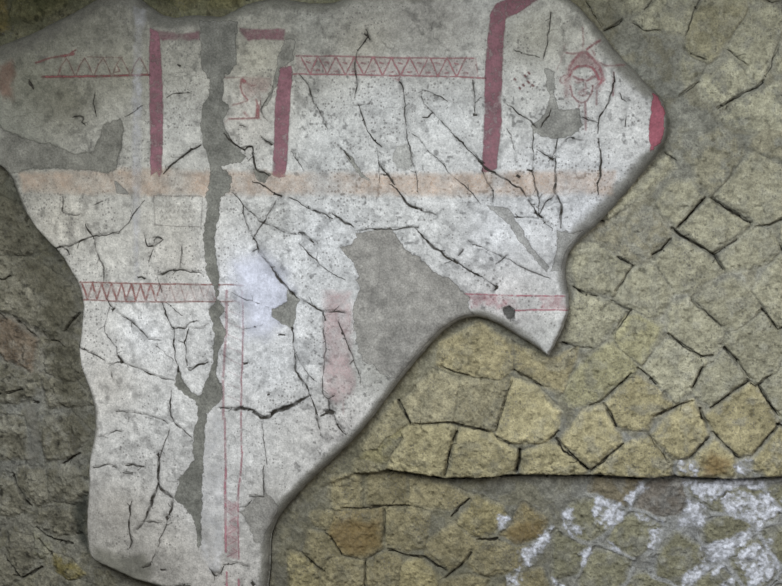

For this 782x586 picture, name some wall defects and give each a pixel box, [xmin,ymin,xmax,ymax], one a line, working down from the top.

flaking render [0,118,124,173]
crack [223,29,574,290]
flaking render [175,20,246,547]
flaking render [272,290,300,328]
flaking render [340,228,474,378]
crack [652,198,782,269]
crack [6,235,208,577]
crack [220,327,346,507]
leakage [522,528,553,567]
leakage [562,508,582,535]
leakage [592,483,644,526]
leakage [679,460,782,586]